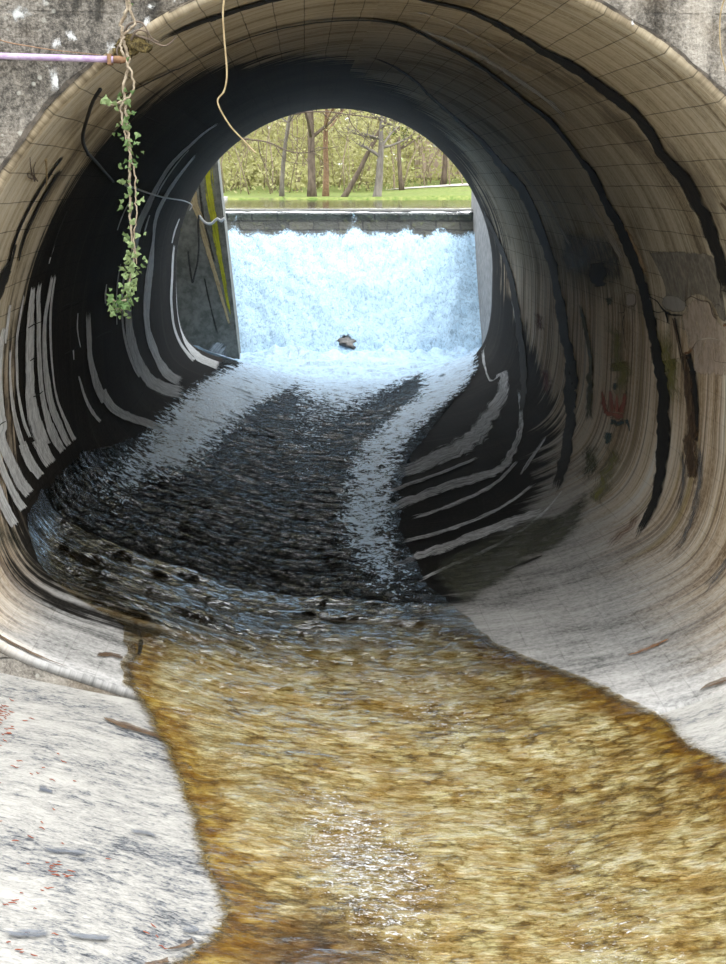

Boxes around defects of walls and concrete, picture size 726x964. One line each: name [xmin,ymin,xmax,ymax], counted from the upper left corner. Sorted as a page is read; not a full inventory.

peeling [650,252,726,375]